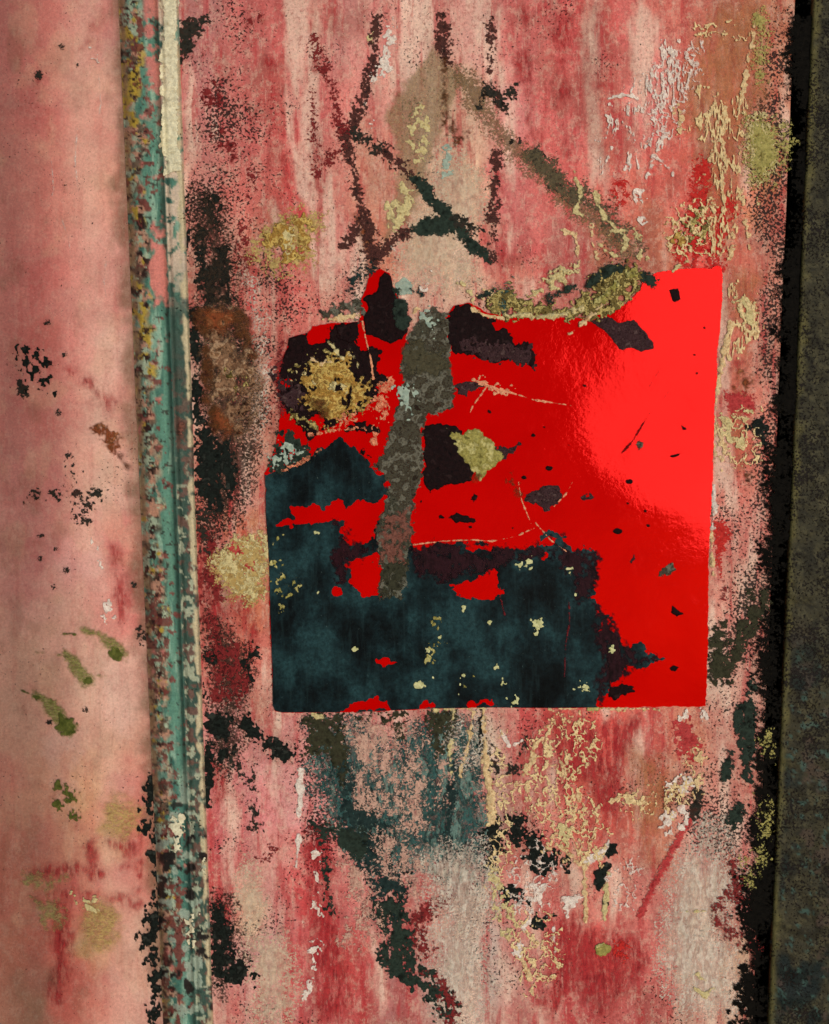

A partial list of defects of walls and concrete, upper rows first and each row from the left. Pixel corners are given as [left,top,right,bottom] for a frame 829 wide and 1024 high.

peeling [158,0,182,176]
corrosion [192,307,258,434]
peeling [447,171,659,371]
peeling [202,260,709,1023]
peeling [134,772,162,1024]
peeling [168,813,186,853]